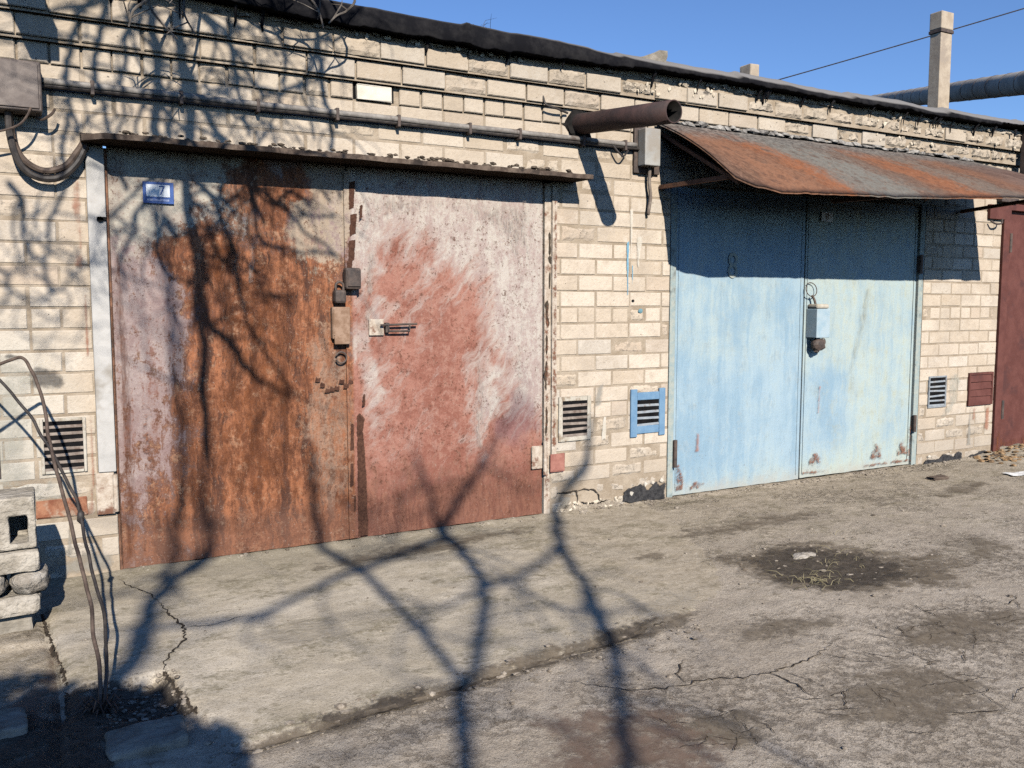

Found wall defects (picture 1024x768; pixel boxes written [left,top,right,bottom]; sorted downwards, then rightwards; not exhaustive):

corrosion [867,427,911,466]
crack [119,579,239,672]
crack [214,596,1024,755]